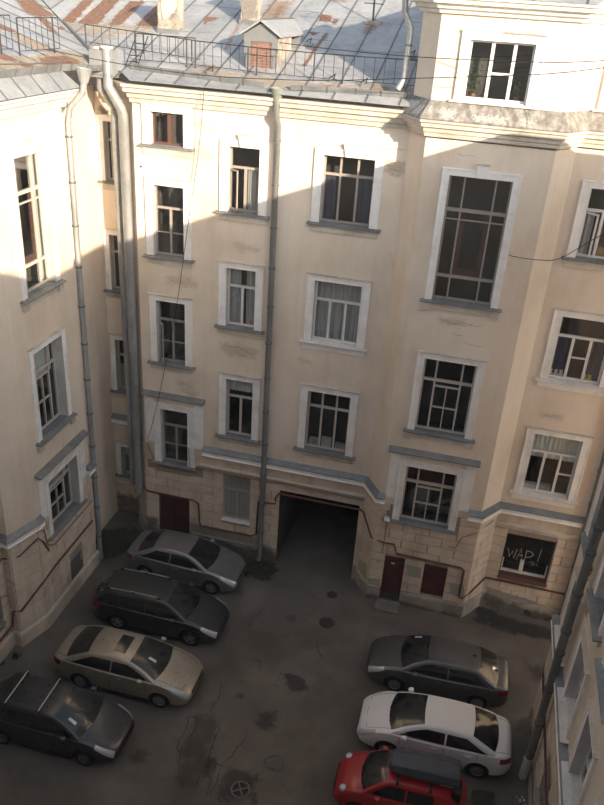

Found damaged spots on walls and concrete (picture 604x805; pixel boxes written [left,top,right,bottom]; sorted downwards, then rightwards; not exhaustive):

rust [17,0,144,33]
rust [138,4,158,26]
spalling [160,0,178,20]
rust [303,32,328,66]